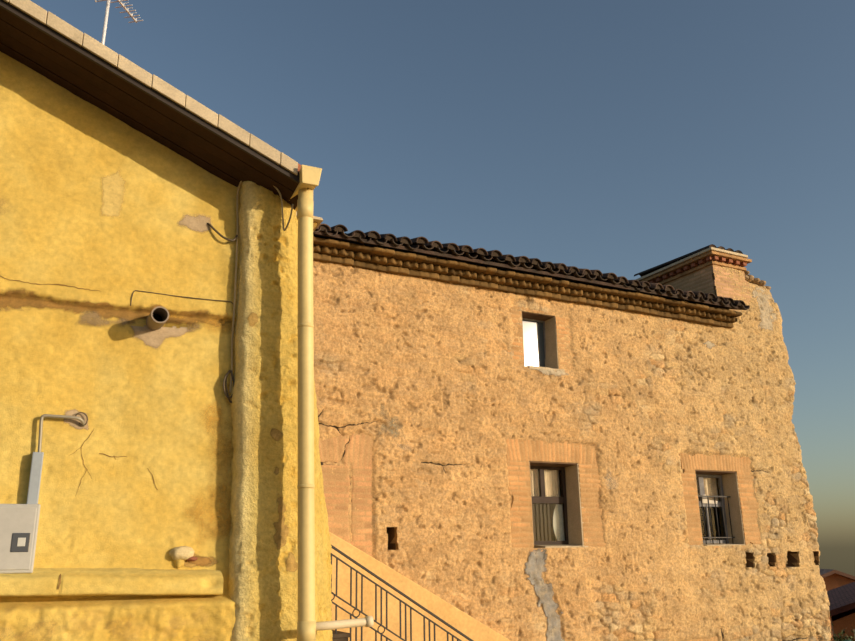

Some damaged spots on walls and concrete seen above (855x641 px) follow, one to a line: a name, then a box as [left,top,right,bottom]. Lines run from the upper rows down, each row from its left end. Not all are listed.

crack [72,429,126,497]
crack [318,410,376,465]